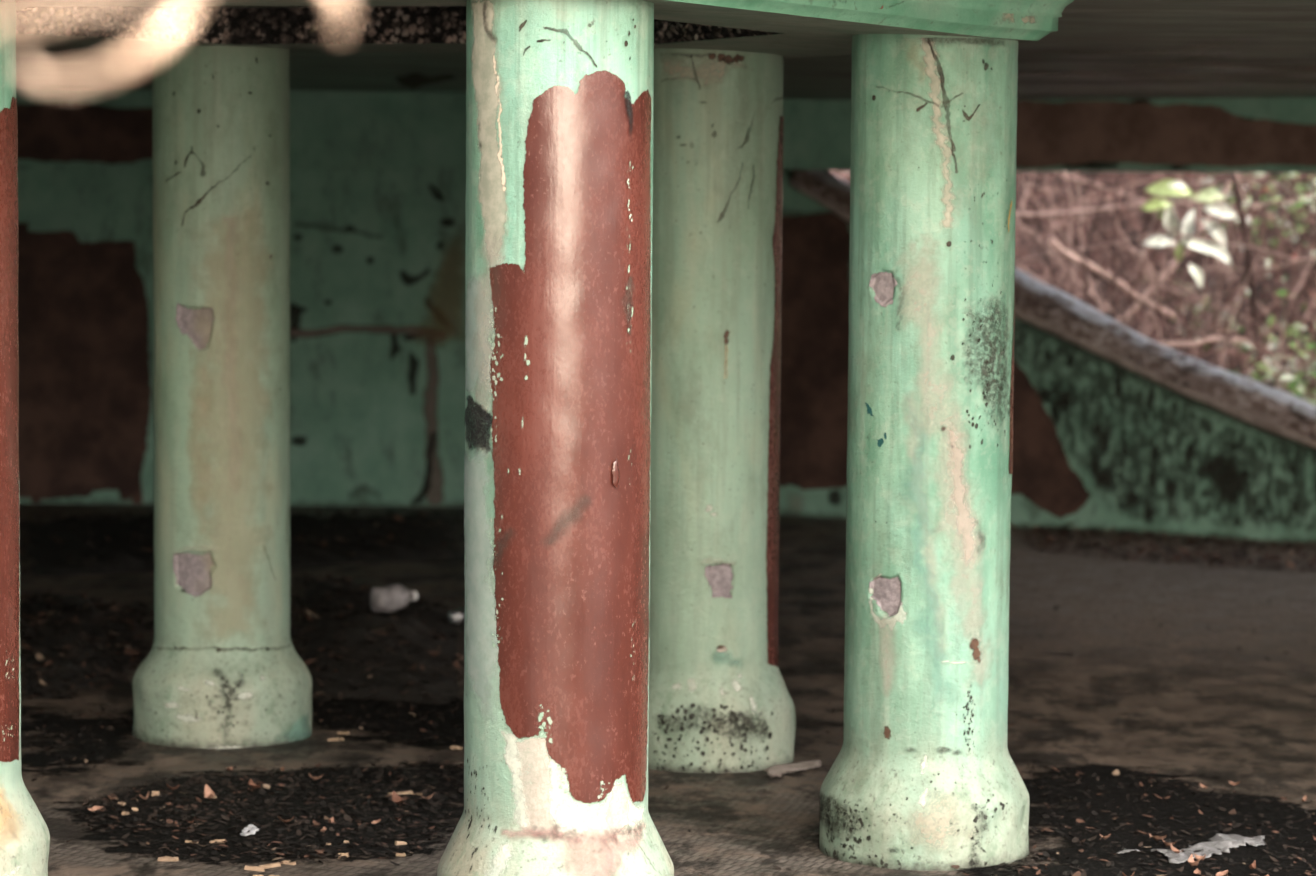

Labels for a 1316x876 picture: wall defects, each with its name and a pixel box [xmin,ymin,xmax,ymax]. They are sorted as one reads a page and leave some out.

crack [171,135,271,226]
crack [914,38,983,247]
spalling [175,303,214,350]
peeling [488,308,503,400]
spalling [869,272,898,307]
damp [950,275,1316,561]
spalling [173,553,214,597]
peeling [489,515,503,647]
spalling [704,564,733,599]
spalling [868,574,906,630]
damp [653,674,773,773]
peeling [502,704,644,837]